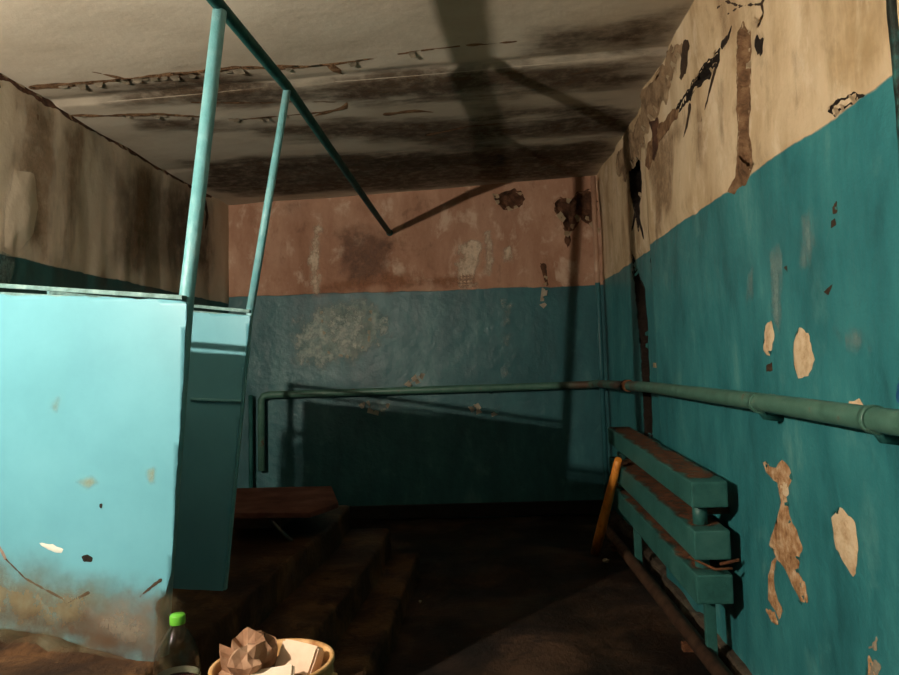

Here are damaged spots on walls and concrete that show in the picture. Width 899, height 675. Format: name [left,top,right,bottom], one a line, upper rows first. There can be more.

leakage [123,76,204,104]
leakage [141,119,199,129]
leakage [217,76,283,106]
leakage [301,65,645,100]
spalling [616,21,764,194]
leakage [207,106,629,195]
spalling [554,189,600,248]
peeling [763,321,774,372]
peeling [793,327,815,378]
peeling [763,460,808,625]
peeling [831,508,858,576]
crack [5,558,90,603]